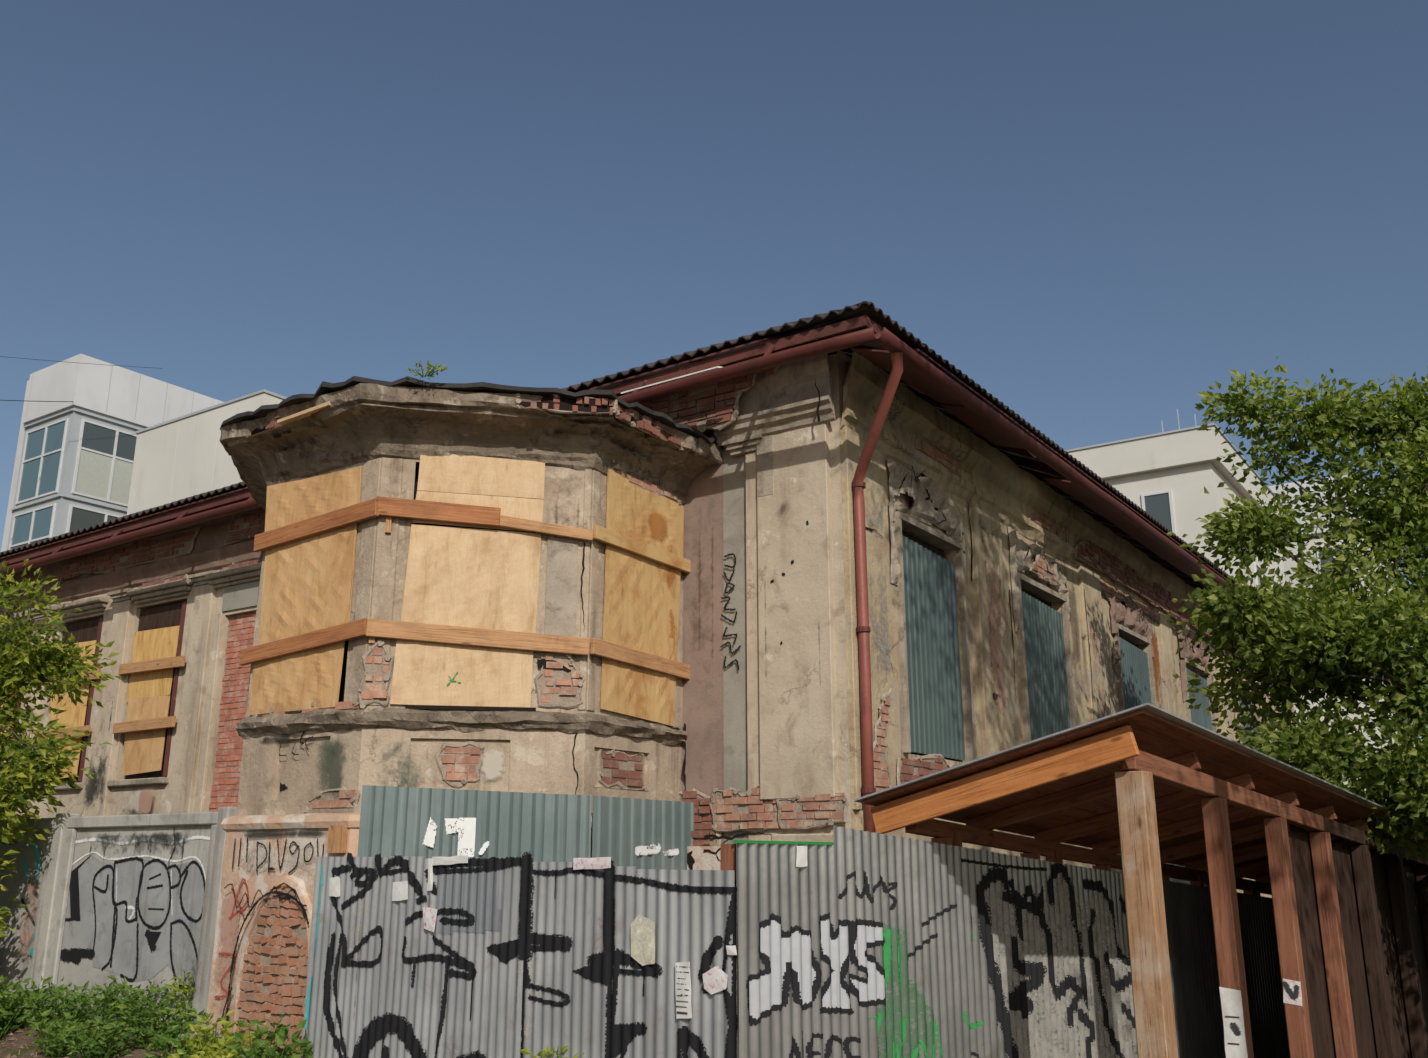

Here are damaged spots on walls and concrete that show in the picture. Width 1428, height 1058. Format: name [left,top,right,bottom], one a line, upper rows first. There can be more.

spalling [887,434,966,585]
spalling [986,513,1214,728]
spalling [252,638,394,718]
spalling [534,652,585,709]
spalling [434,740,504,789]
spalling [596,748,646,790]
spalling [873,688,955,792]
spalling [302,787,360,814]
spalling [679,784,849,846]